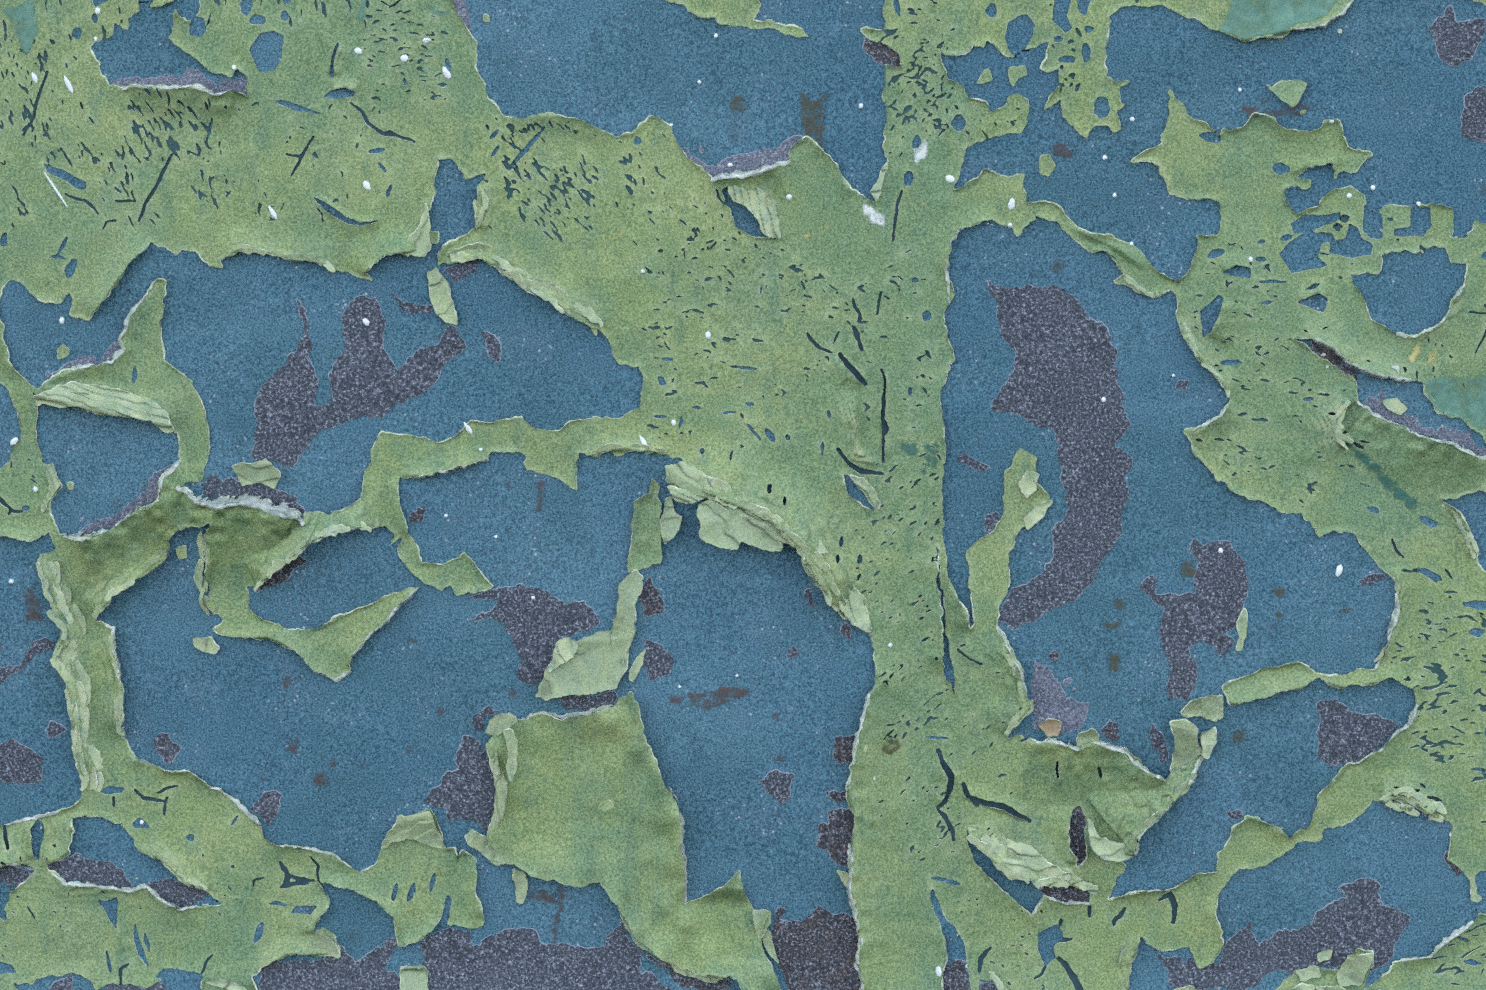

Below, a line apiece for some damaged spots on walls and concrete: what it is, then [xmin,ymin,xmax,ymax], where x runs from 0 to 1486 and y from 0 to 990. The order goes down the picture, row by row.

peeling [0,0,913,990]
peeling [912,135,921,150]
peeling [922,0,1486,990]